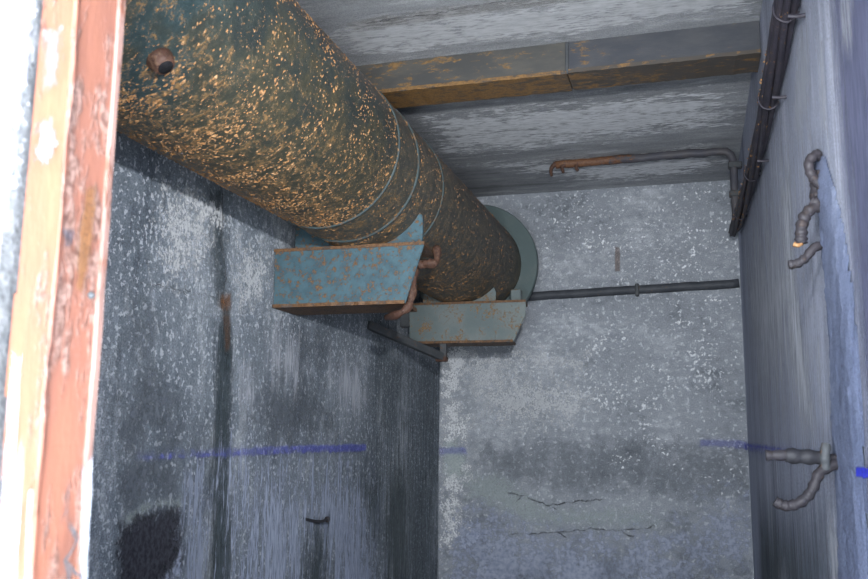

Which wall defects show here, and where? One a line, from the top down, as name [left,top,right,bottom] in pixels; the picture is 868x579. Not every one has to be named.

crack [508,492,602,510]
crack [512,525,654,538]